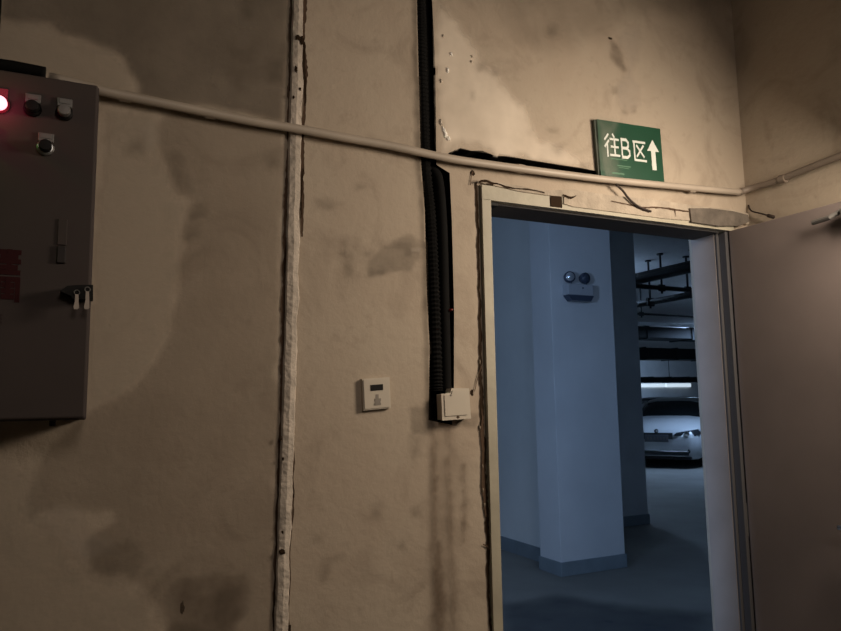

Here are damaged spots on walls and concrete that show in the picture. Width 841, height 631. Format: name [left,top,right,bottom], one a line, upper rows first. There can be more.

crack [272,0,308,631]